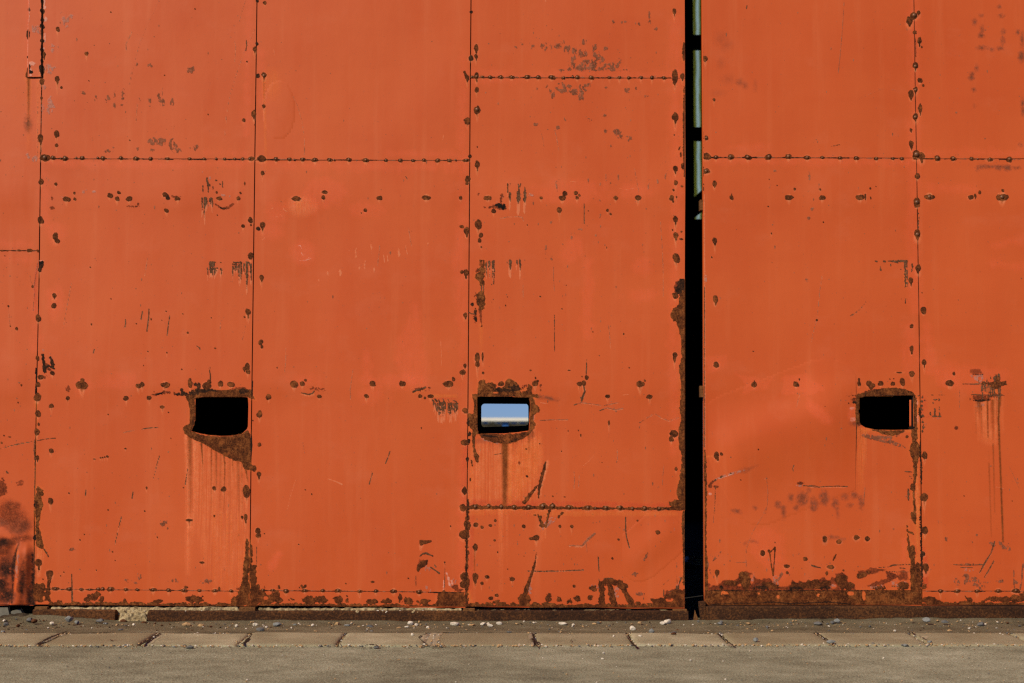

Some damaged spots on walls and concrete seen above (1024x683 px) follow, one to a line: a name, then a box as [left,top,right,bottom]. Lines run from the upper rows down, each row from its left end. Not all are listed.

peeling [513,11,658,130]
rust [0,279,685,608]
rust [704,278,1024,605]